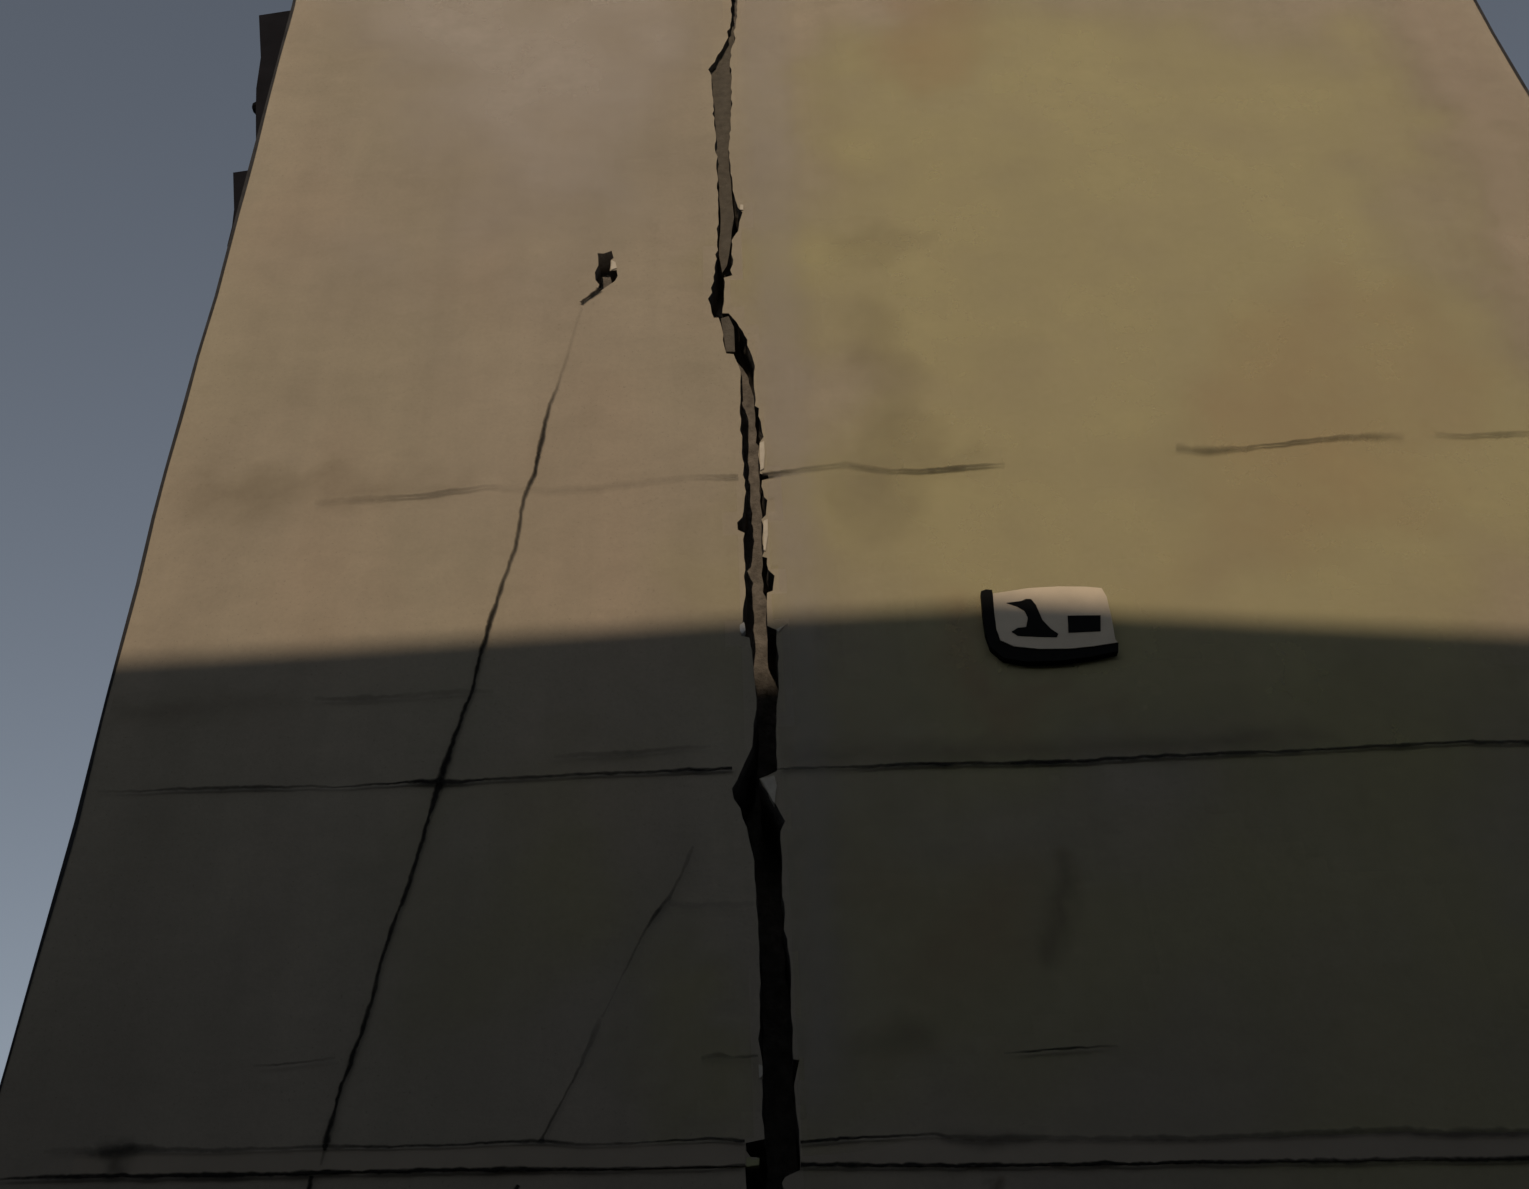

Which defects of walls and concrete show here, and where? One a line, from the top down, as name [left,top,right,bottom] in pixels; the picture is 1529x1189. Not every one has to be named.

crack [154,784,313,792]
crack [270,399,745,1150]
crack [708,0,1529,1189]
crack [0,1164,745,1189]